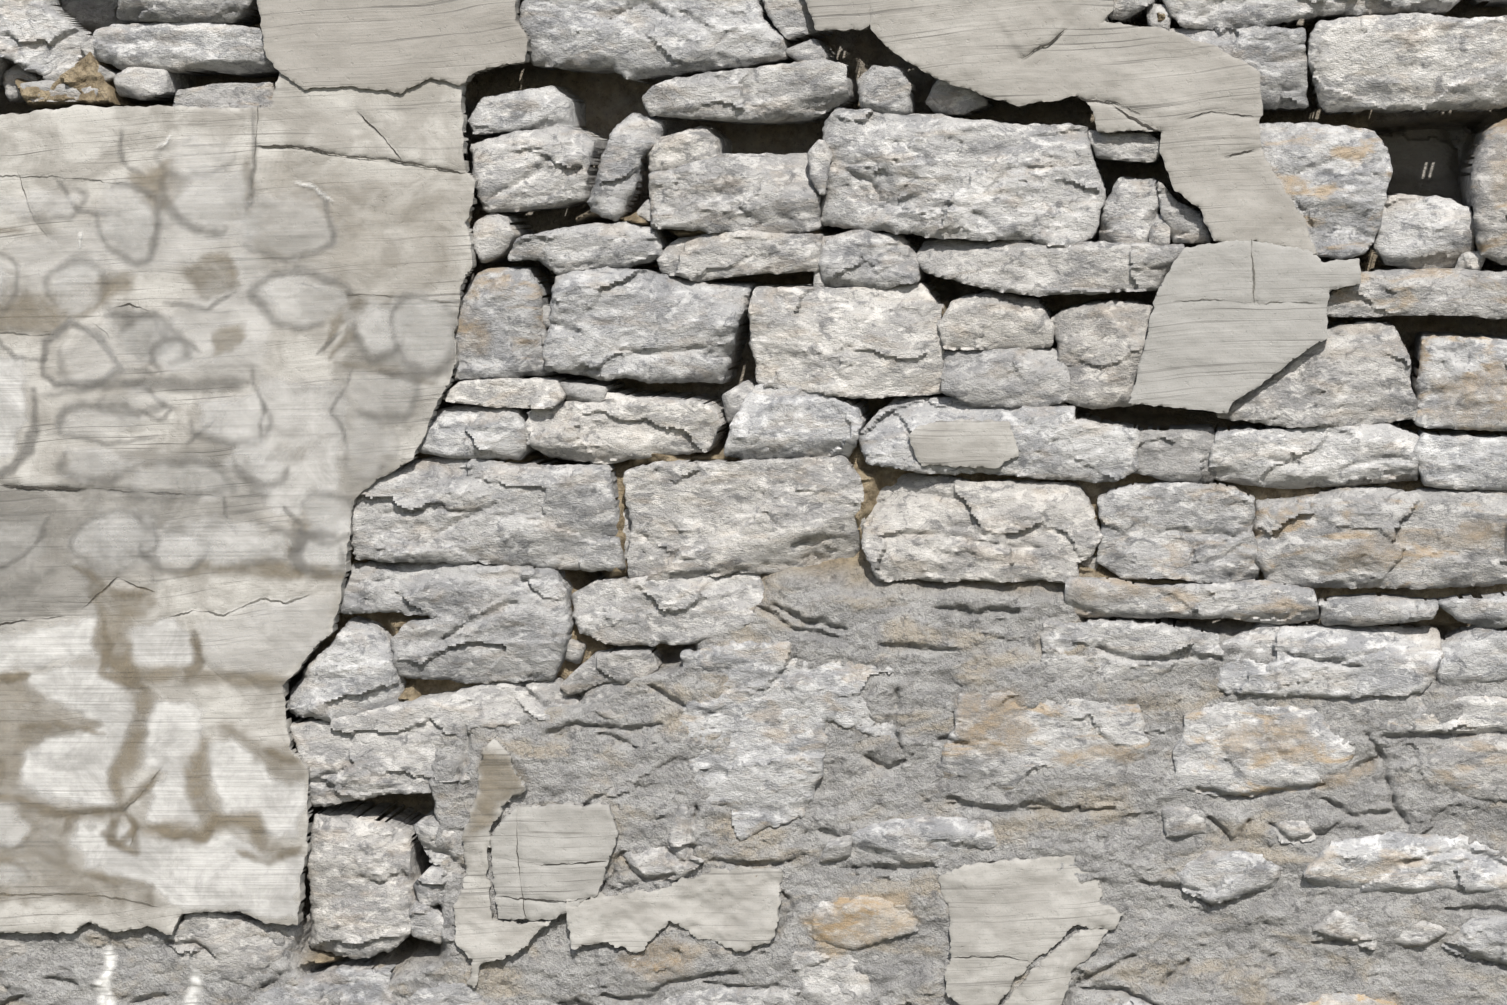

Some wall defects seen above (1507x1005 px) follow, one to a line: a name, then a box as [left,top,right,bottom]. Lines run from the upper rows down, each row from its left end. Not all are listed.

crack [0,175,126,233]
crack [249,105,460,214]
flaking render [805,0,1361,413]
crack [0,330,51,338]
crack [290,280,453,303]
crack [3,484,219,497]
flaking render [0,0,531,936]
flaking render [908,418,1019,468]
crack [0,577,308,679]
leakage [0,594,307,918]
flaking render [453,737,783,988]
flaking render [936,855,1124,1005]